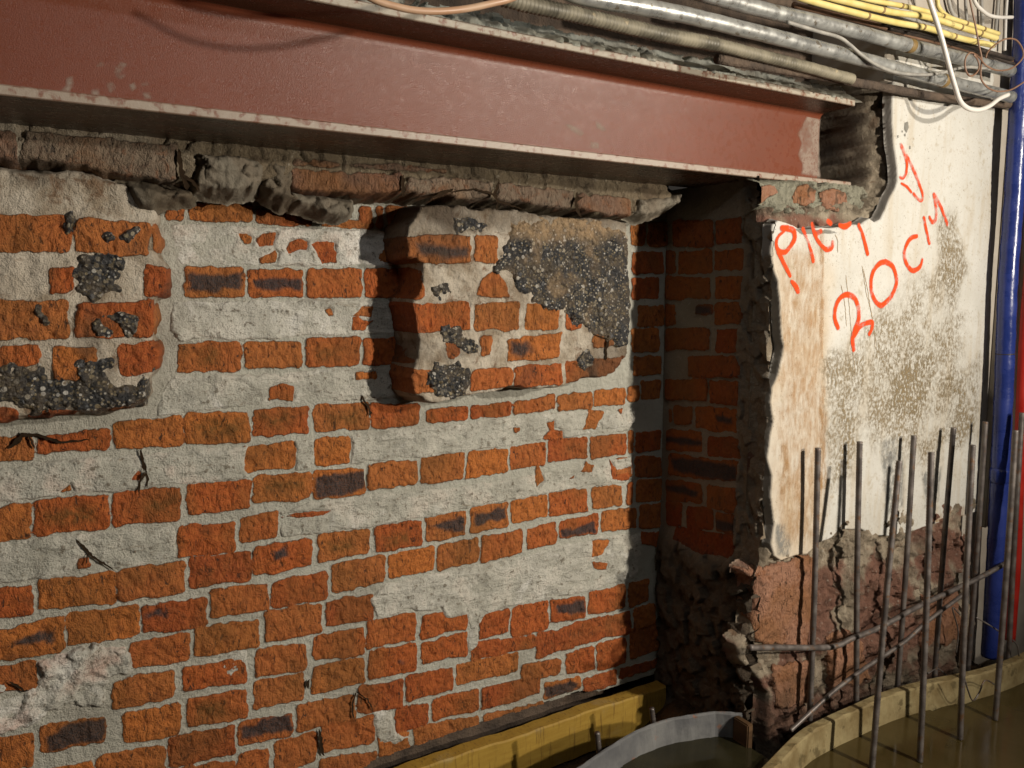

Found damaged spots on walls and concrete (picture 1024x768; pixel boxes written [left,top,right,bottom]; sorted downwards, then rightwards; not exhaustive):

damp [824,216,978,509]
crack [7,432,89,449]
crack [138,449,149,493]
crack [76,539,114,571]
spalling [747,412,1024,768]
spalling [0,642,135,735]